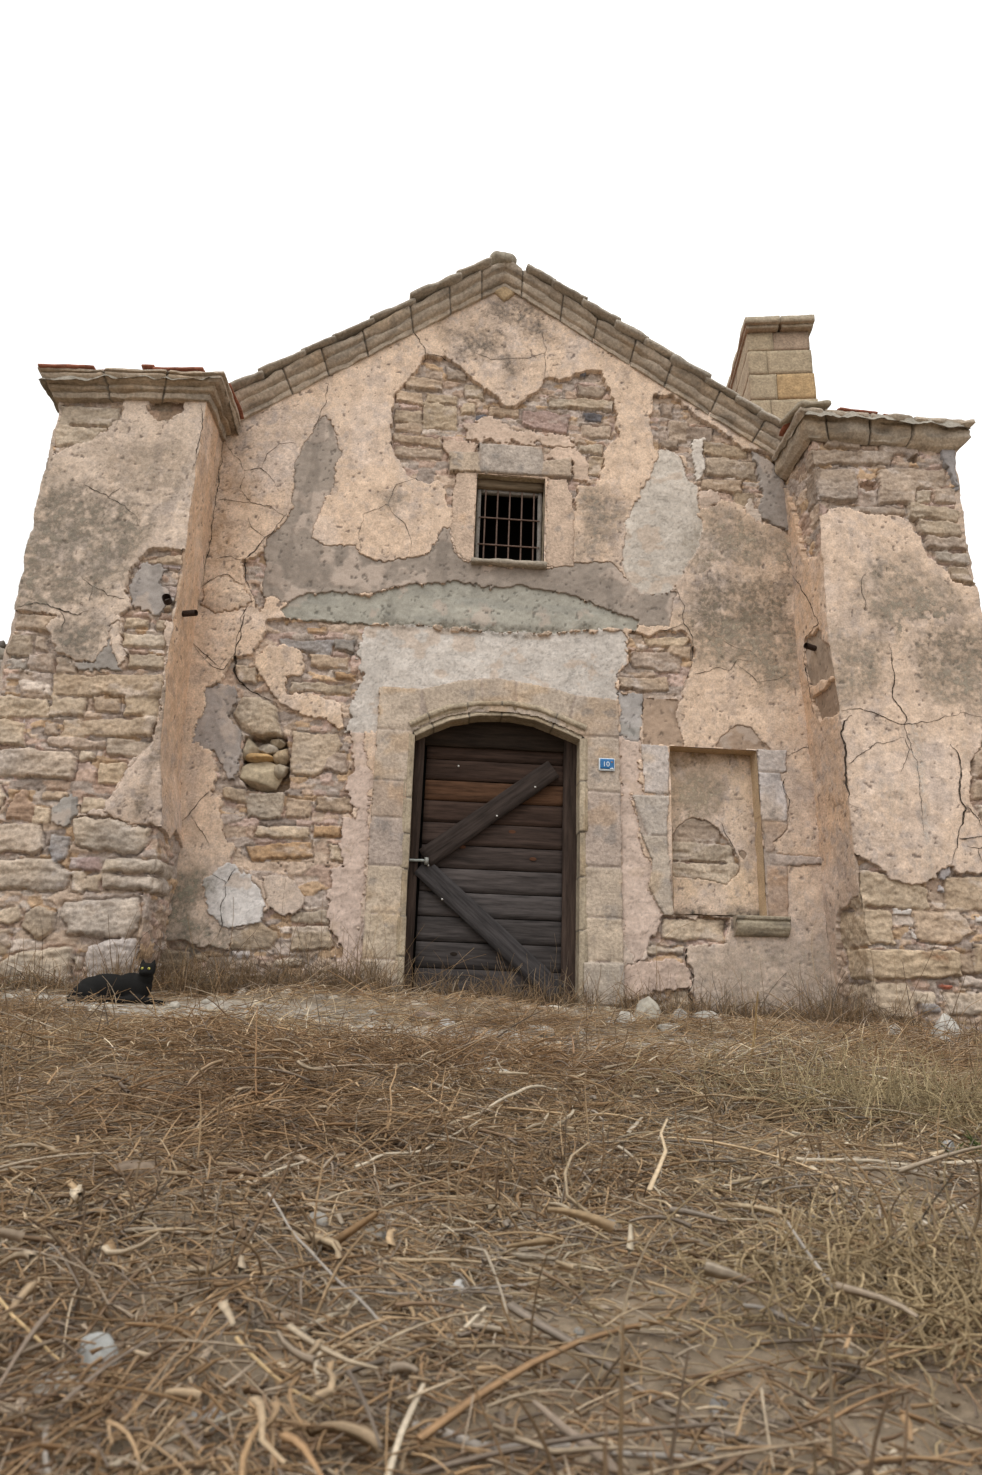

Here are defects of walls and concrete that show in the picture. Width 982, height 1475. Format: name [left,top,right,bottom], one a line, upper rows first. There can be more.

crack [193,386,328,703]
spalling [390,357,619,511]
spalling [0,397,976,1013]
crack [662,550,982,862]
spalling [969,741,982,821]
spalling [839,856,982,1037]